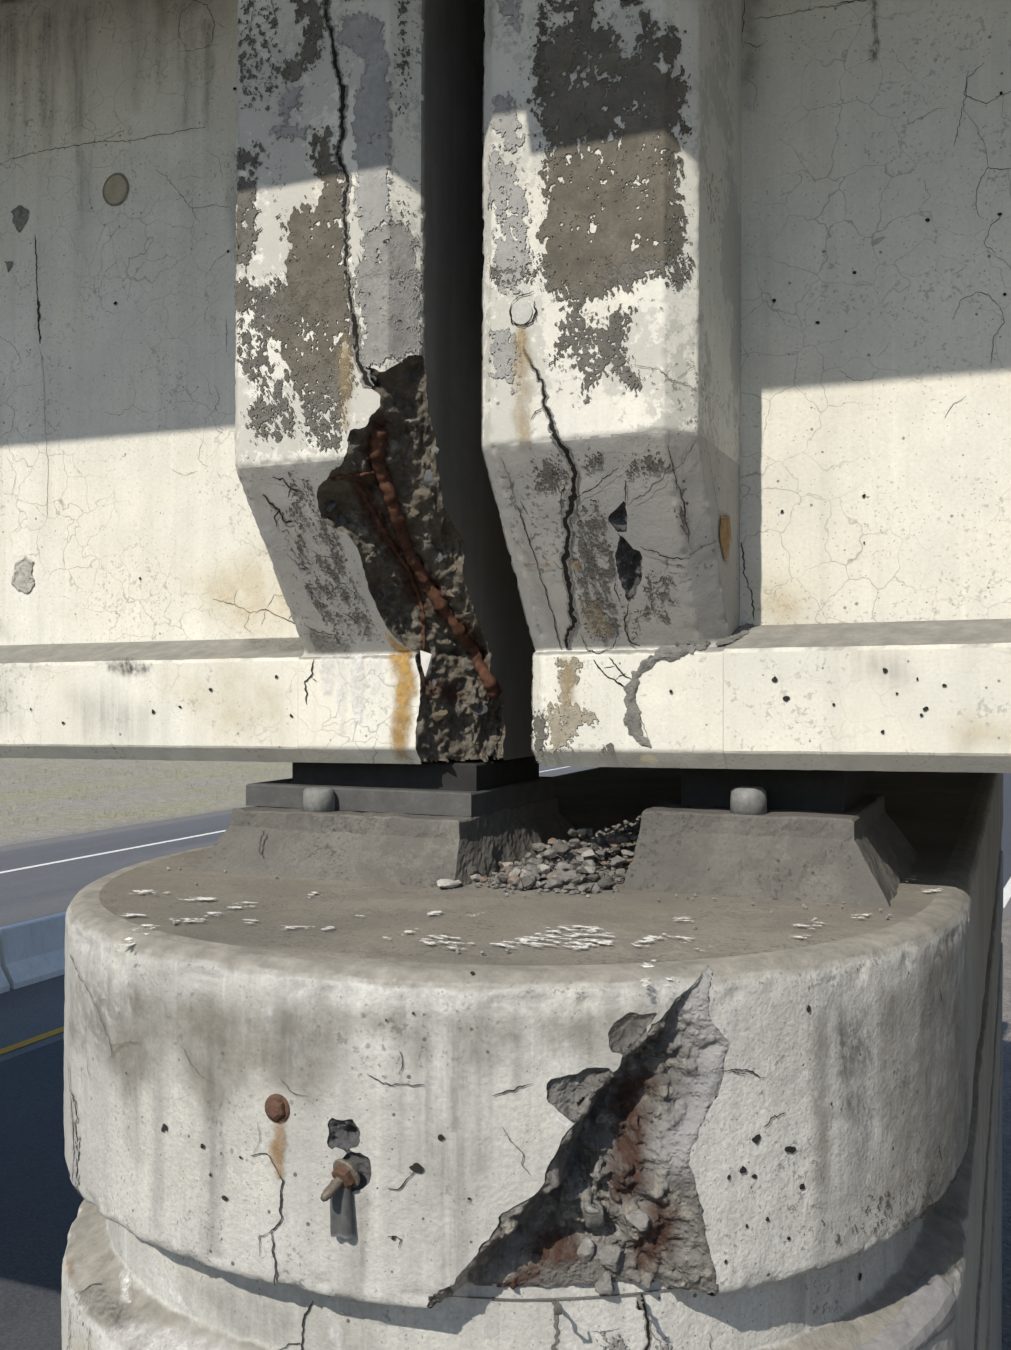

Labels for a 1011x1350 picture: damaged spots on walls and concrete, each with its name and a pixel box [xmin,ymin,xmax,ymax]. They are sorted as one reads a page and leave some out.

crack [322,0,401,388]
peeling [487,0,698,408]
crack [908,65,1011,364]
spalling [234,0,505,763]
rust [385,634,416,756]
spalling [530,445,678,646]
crack [500,291,755,748]
peeling [673,486,691,536]
crack [251,1122,284,1285]
rust [273,1127,284,1177]
crack [278,1301,313,1350]
spalling [427,963,730,1307]